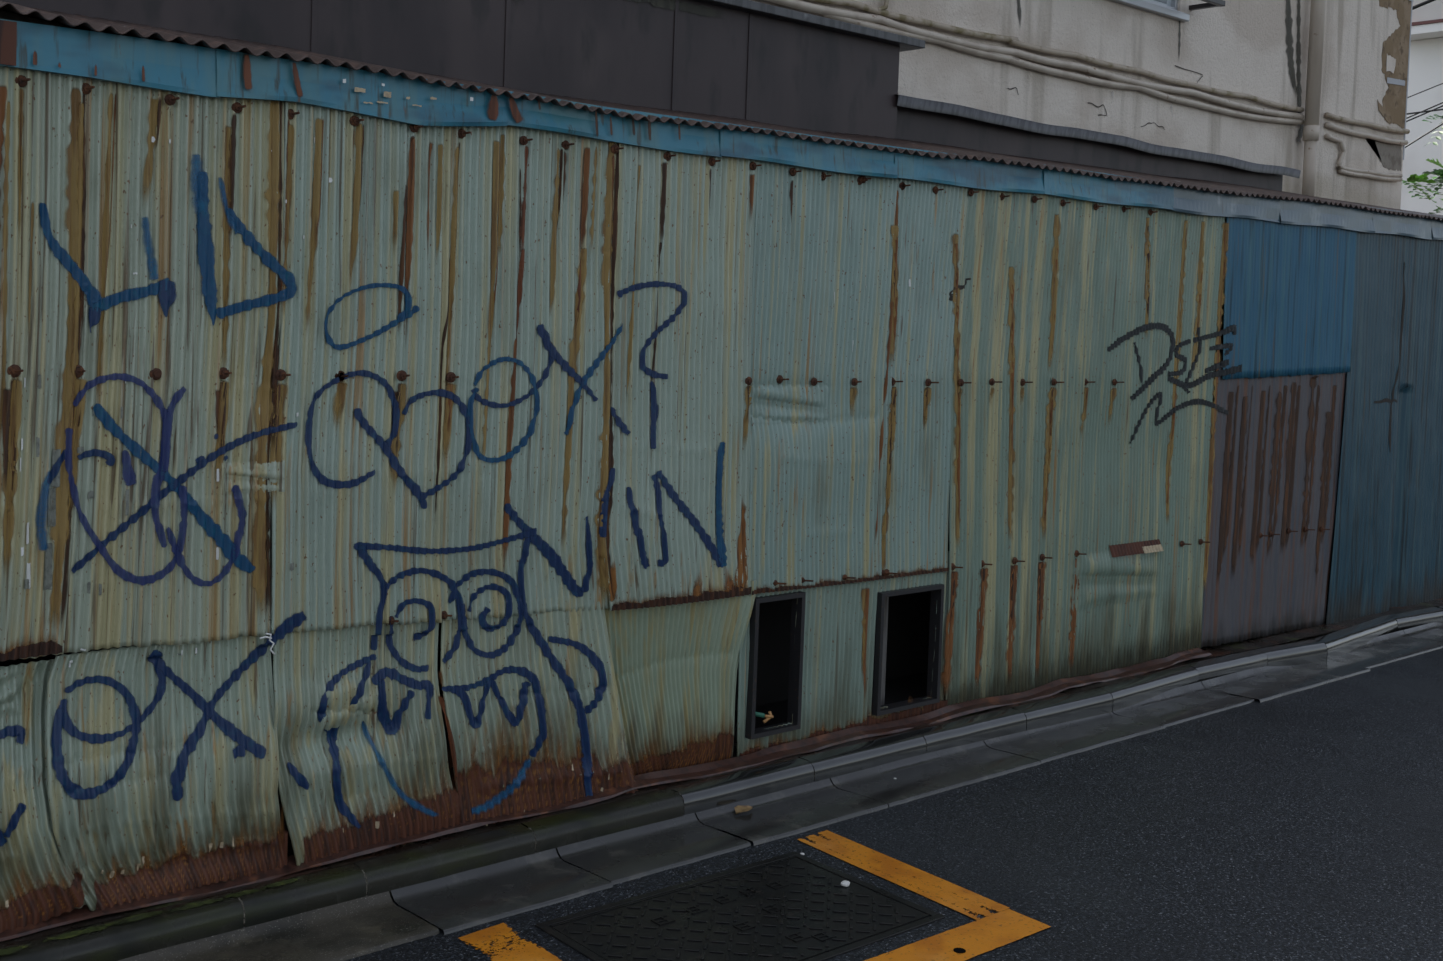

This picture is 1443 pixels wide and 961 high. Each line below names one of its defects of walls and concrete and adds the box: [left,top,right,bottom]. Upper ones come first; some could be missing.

rust [243,55,252,89]
flaking render [1366,0,1413,171]
rust [0,62,1201,933]
rust [1165,220,1337,584]